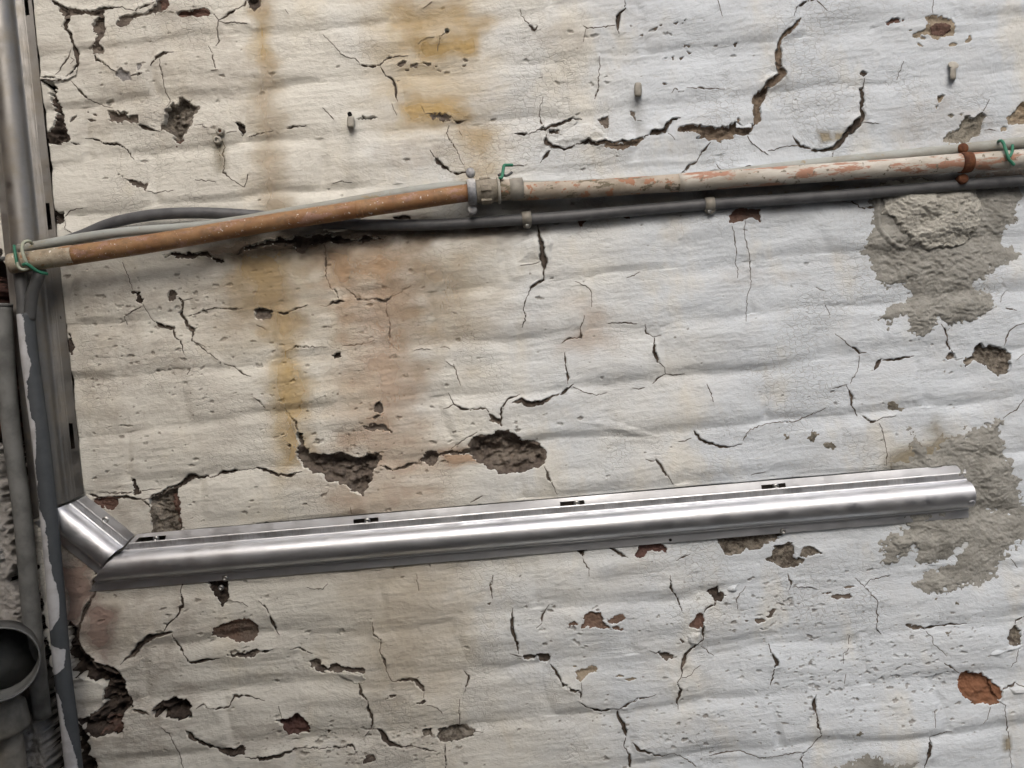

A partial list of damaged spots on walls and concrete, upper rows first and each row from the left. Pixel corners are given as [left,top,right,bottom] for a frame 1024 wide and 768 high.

crack [42,0,170,108]
spalling [70,97,200,147]
crack [513,98,681,166]
crack [682,78,879,173]
crack [274,253,681,449]
spalling [946,343,1011,377]
spalling [296,433,382,497]
spalling [420,414,547,474]
spalling [149,486,183,533]
crack [550,554,822,768]
flaking render [957,671,1002,705]
crack [133,683,447,768]